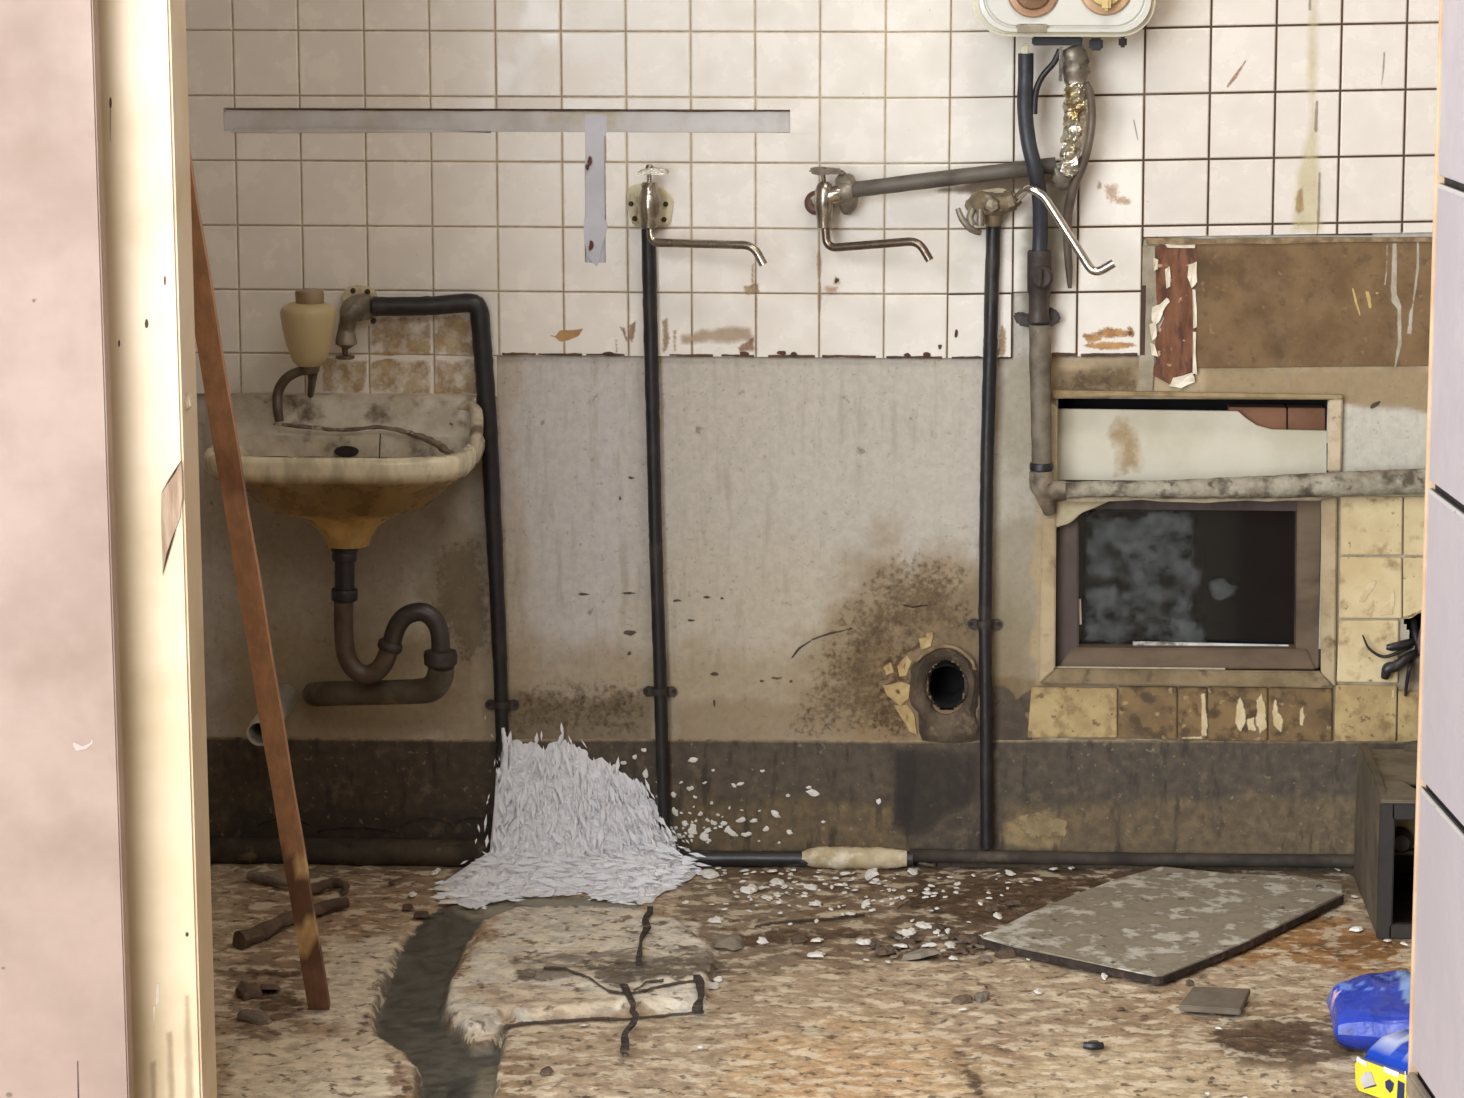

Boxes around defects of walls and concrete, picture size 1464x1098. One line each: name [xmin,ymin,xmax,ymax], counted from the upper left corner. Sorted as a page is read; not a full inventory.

leakage [323,315,476,394]
rust [1083,327,1134,350]
peeling [1051,243,1197,388]
flaking render [1227,404,1325,430]
leakage [802,565,968,733]
flaking render [883,632,980,743]
leakage [978,686,1032,740]